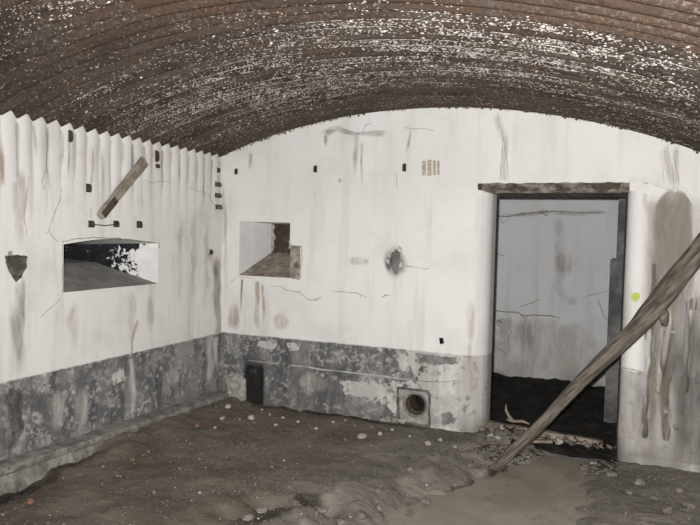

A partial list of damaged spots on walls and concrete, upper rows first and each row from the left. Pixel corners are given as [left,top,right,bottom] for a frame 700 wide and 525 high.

crack [498,210,606,218]
spalling [386,246,403,274]
crack [274,286,390,301]
crack [494,299,560,319]
peeling [257,339,277,349]
peeling [397,352,410,372]
peeling [111,369,127,385]
peeling [300,372,397,416]
peeling [52,385,89,428]
peeling [434,392,462,432]